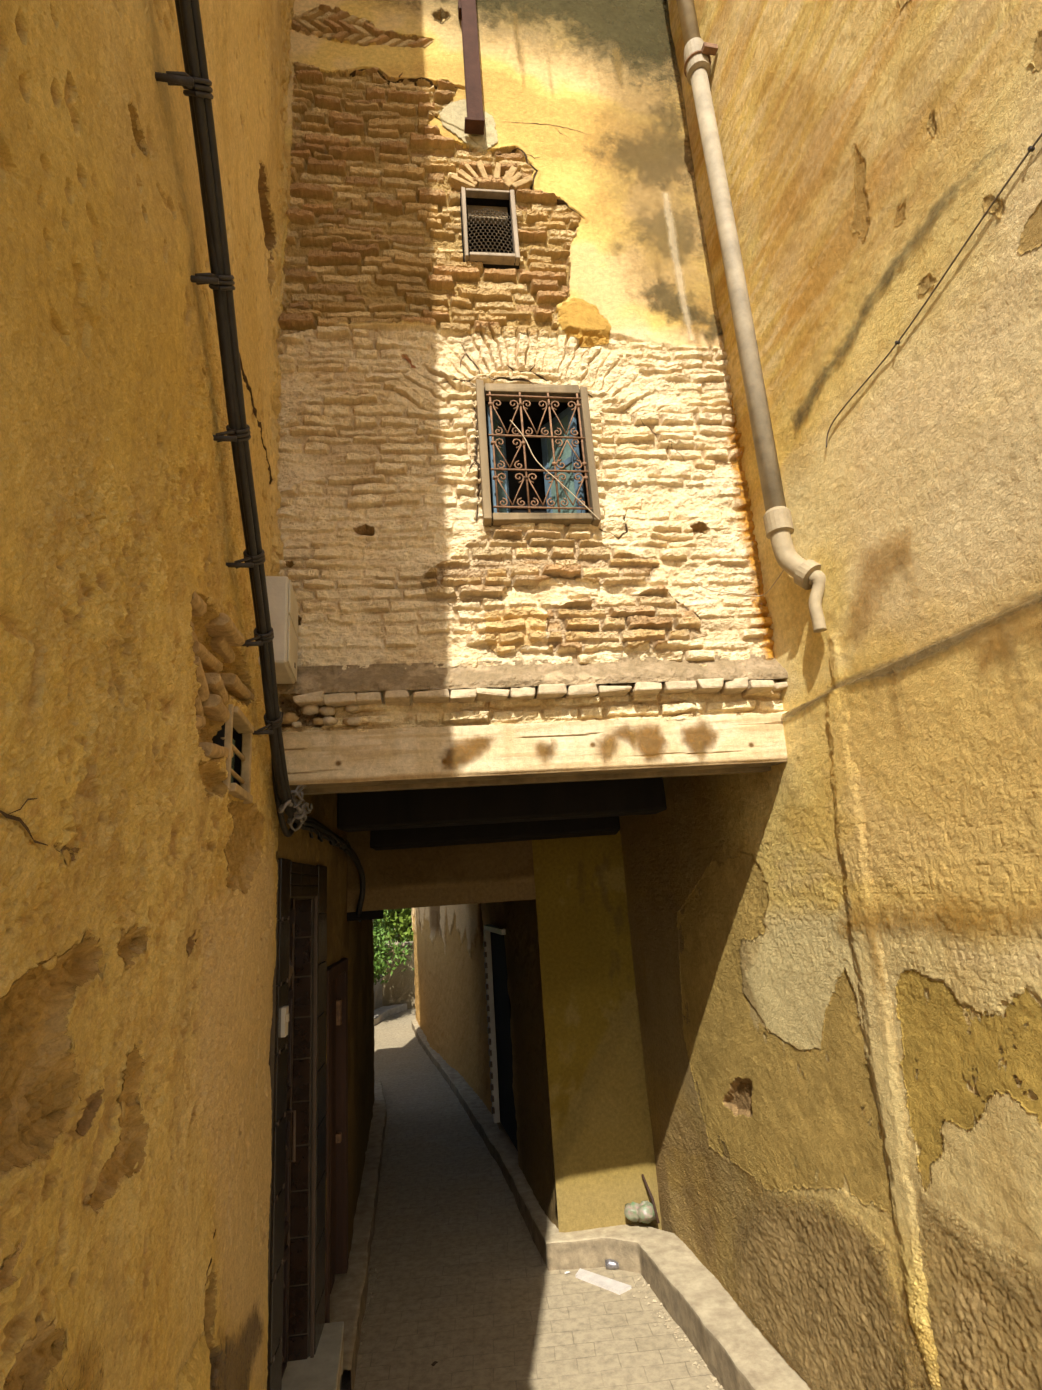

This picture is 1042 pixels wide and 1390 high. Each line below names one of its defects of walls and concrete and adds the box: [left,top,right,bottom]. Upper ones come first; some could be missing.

leakage [388,0,458,19]
peeling [1027,31,1042,71]
flaking render [258,61,581,339]
leakage [476,0,723,339]
peeling [982,197,1003,218]
peeling [1017,200,1042,255]
crack [239,353,273,484]
leakage [781,591,1042,721]
flaking render [190,591,265,894]
crack [0,798,48,846]
peeling [676,852,1042,1390]
leakage [209,1313,262,1390]